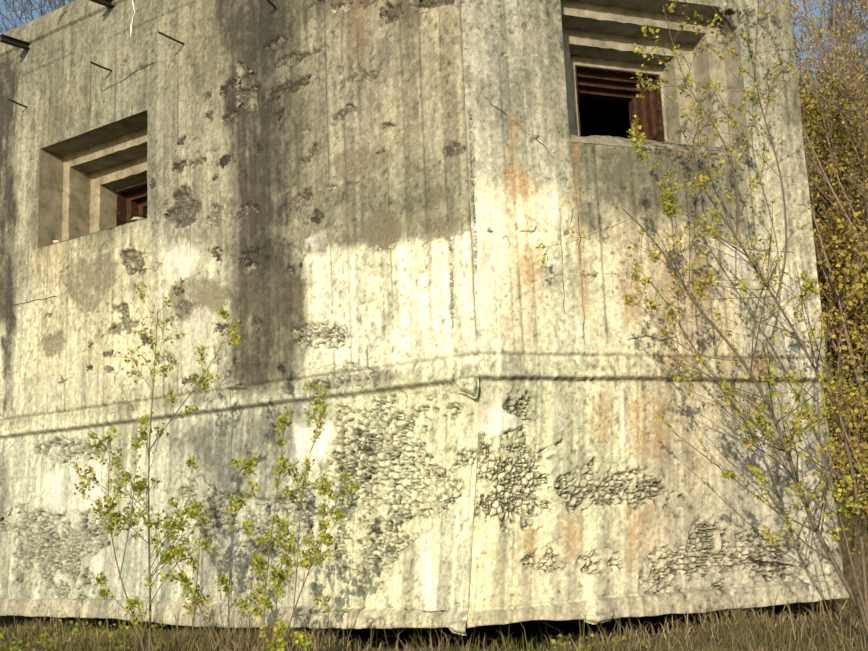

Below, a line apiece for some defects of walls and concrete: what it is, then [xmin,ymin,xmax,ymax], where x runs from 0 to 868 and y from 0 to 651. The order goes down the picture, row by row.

spalling [203,61,319,124]
spalling [264,35,322,70]
spalling [308,0,459,28]
damp [0,57,17,370]
damp [216,0,307,384]
spalling [419,110,493,339]
crack [559,147,585,343]
spalling [291,322,349,352]
spalling [32,436,124,465]
spalling [170,361,695,580]
spalling [0,503,120,604]
spalling [638,518,810,598]